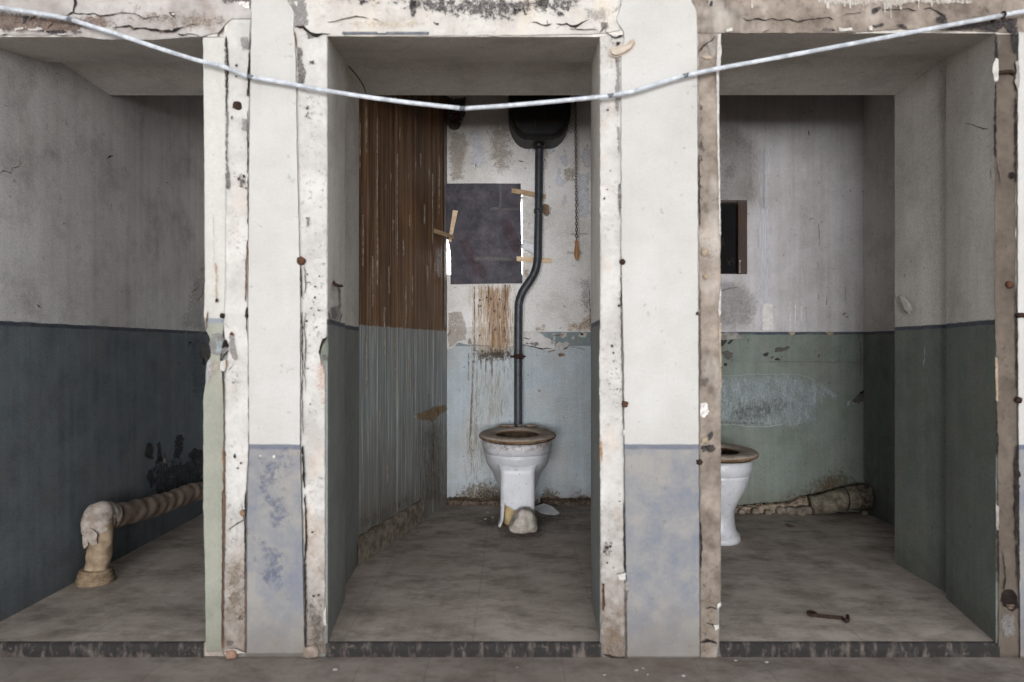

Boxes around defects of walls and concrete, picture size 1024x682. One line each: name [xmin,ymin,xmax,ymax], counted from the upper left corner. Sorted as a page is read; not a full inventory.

flaking render [0,0,252,655]
crack [65,0,201,38]
flaking render [288,0,630,657]
corrosion [473,285,510,353]
flaking render [692,0,1024,657]